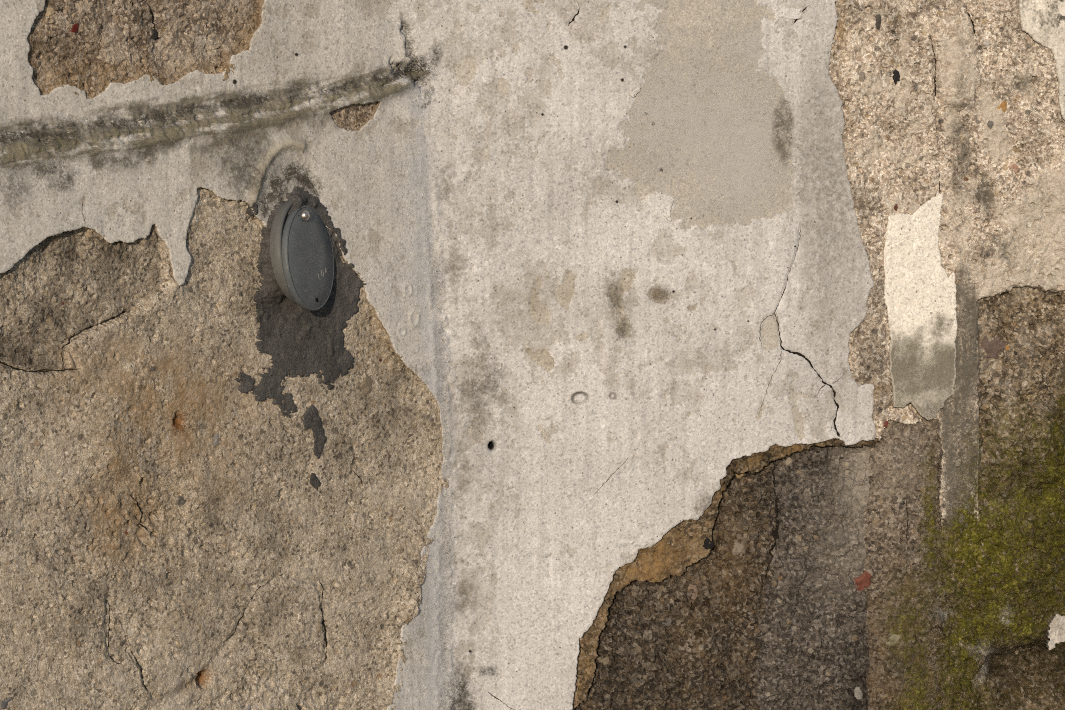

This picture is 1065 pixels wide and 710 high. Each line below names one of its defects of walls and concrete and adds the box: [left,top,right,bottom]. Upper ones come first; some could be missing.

spalling [27,0,261,99]
spalling [329,102,378,131]
crack [0,311,125,372]
peeling [525,348,555,372]
peeling [529,270,577,325]
crack [759,226,848,437]
spalling [573,0,1065,710]
water stain [890,270,981,531]
spalling [0,187,449,710]
crack [108,603,148,691]
crack [319,581,327,665]